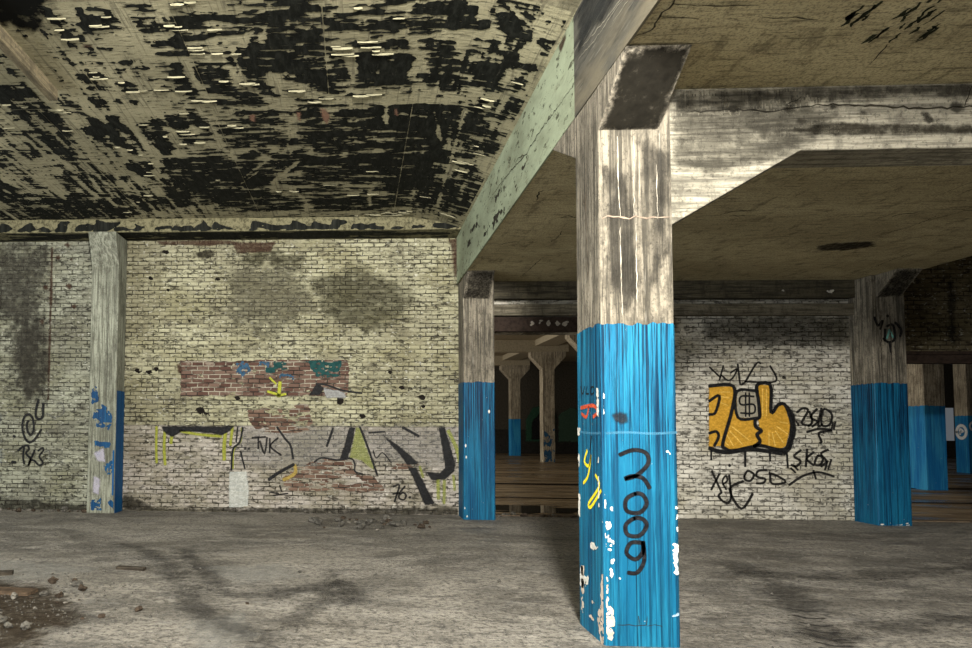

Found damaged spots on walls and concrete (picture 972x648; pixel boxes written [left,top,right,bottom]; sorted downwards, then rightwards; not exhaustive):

crack [634,0,818,38]
peeling [0,0,566,254]
damp [603,47,972,171]
damp [313,273,412,329]
damp [604,170,639,309]
damp [645,143,667,280]
peeling [580,476,621,644]